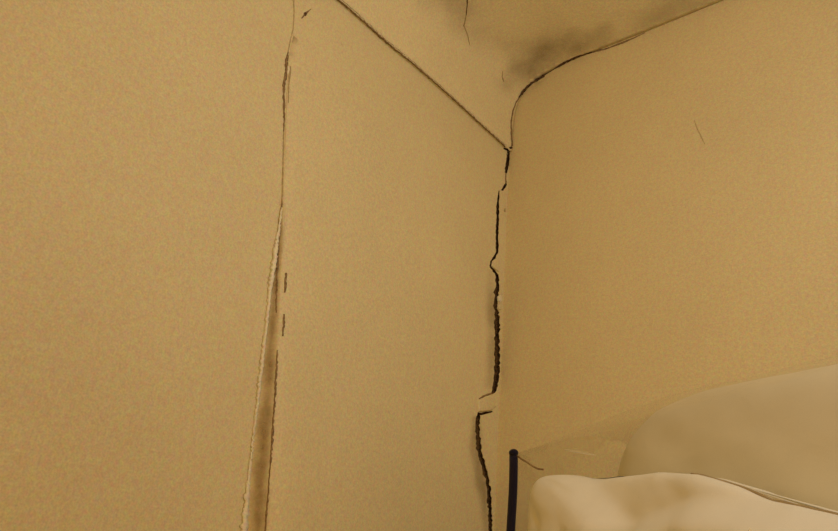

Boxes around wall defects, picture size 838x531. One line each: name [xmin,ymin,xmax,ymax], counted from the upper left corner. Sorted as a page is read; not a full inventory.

crack [281,0,295,203]
crack [337,0,725,531]